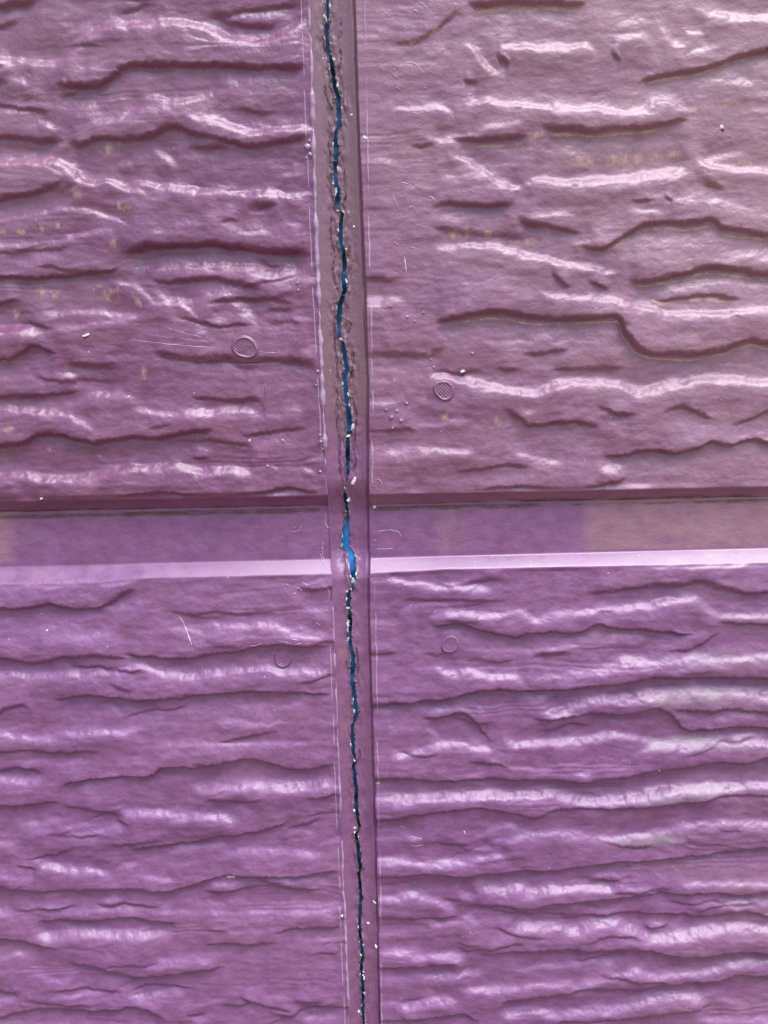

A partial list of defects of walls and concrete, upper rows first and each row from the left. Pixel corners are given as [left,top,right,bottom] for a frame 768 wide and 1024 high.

crack [323,0,367,1024]